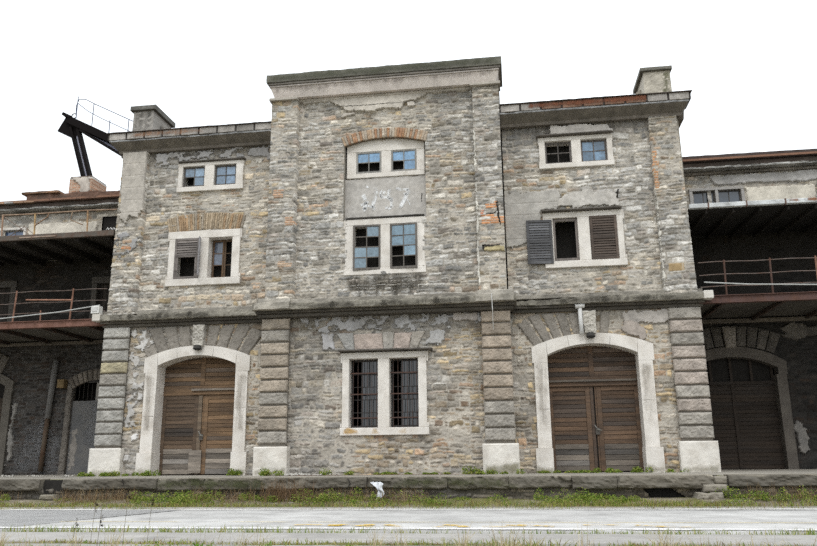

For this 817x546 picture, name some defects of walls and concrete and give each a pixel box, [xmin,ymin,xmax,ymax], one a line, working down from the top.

flaking render [504,189,619,249]
flaking render [4,403,19,466]
flaking render [794,420,810,455]